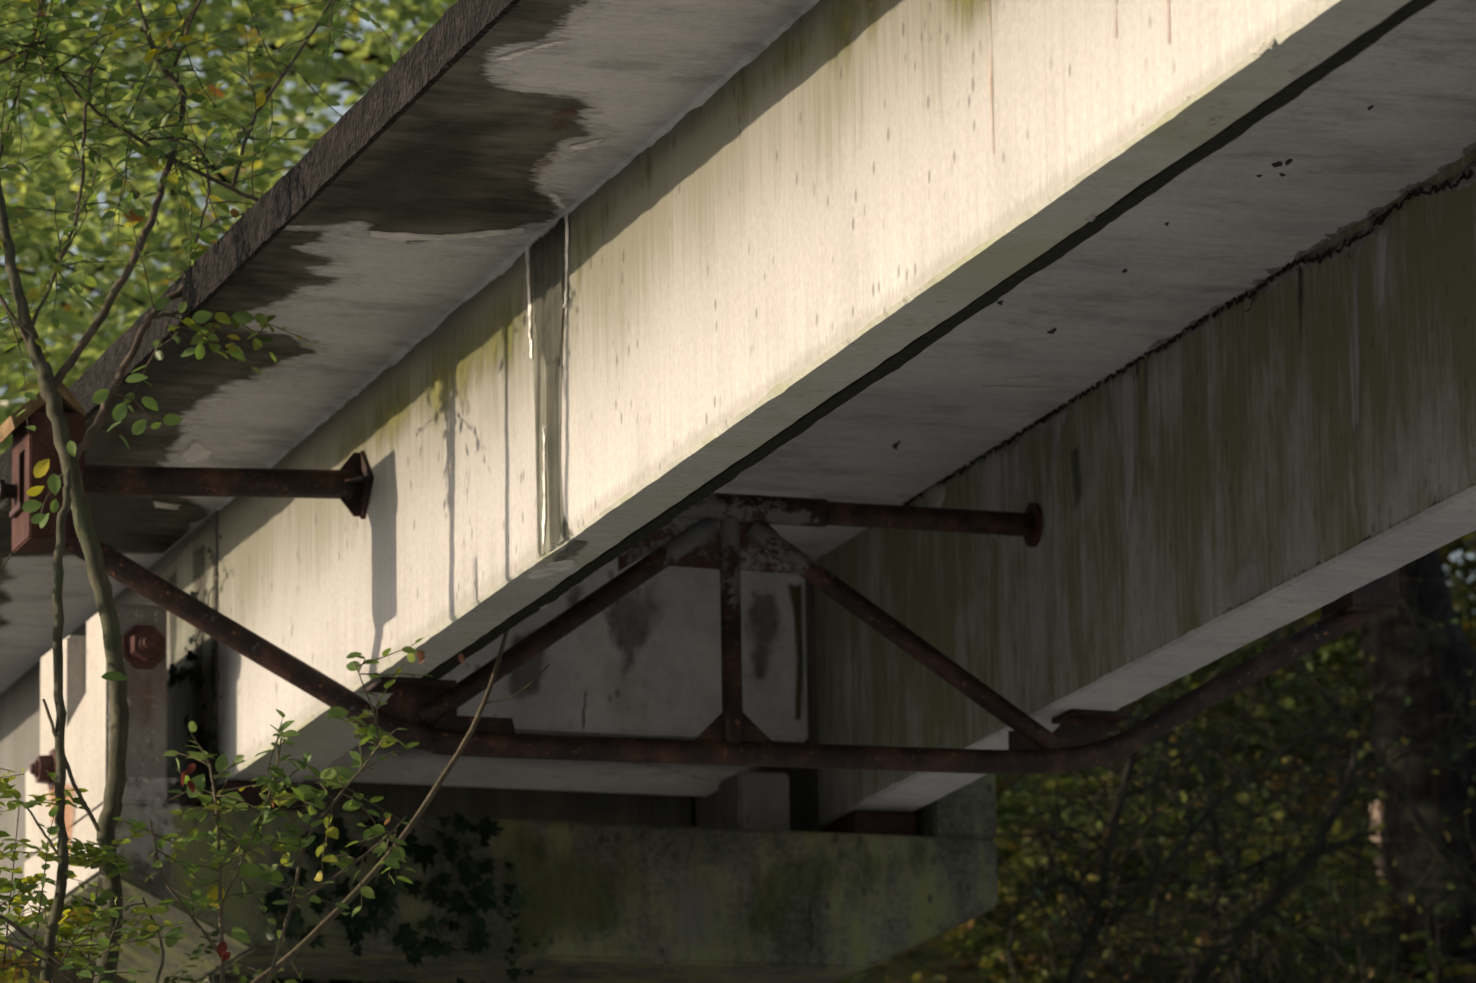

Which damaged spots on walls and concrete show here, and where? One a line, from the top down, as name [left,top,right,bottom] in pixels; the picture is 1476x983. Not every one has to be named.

spalling [1256,158,1293,178]
spalling [1398,142,1476,198]
water stain [85,0,615,579]
spalling [1252,207,1384,293]
water stain [1350,278,1360,431]
water stain [984,444,1020,512]
water stain [1110,368,1136,537]
water stain [0,499,73,628]
water stain [85,494,215,609]
water stain [610,598,655,669]
water stain [750,596,777,679]
water stain [167,611,215,806]